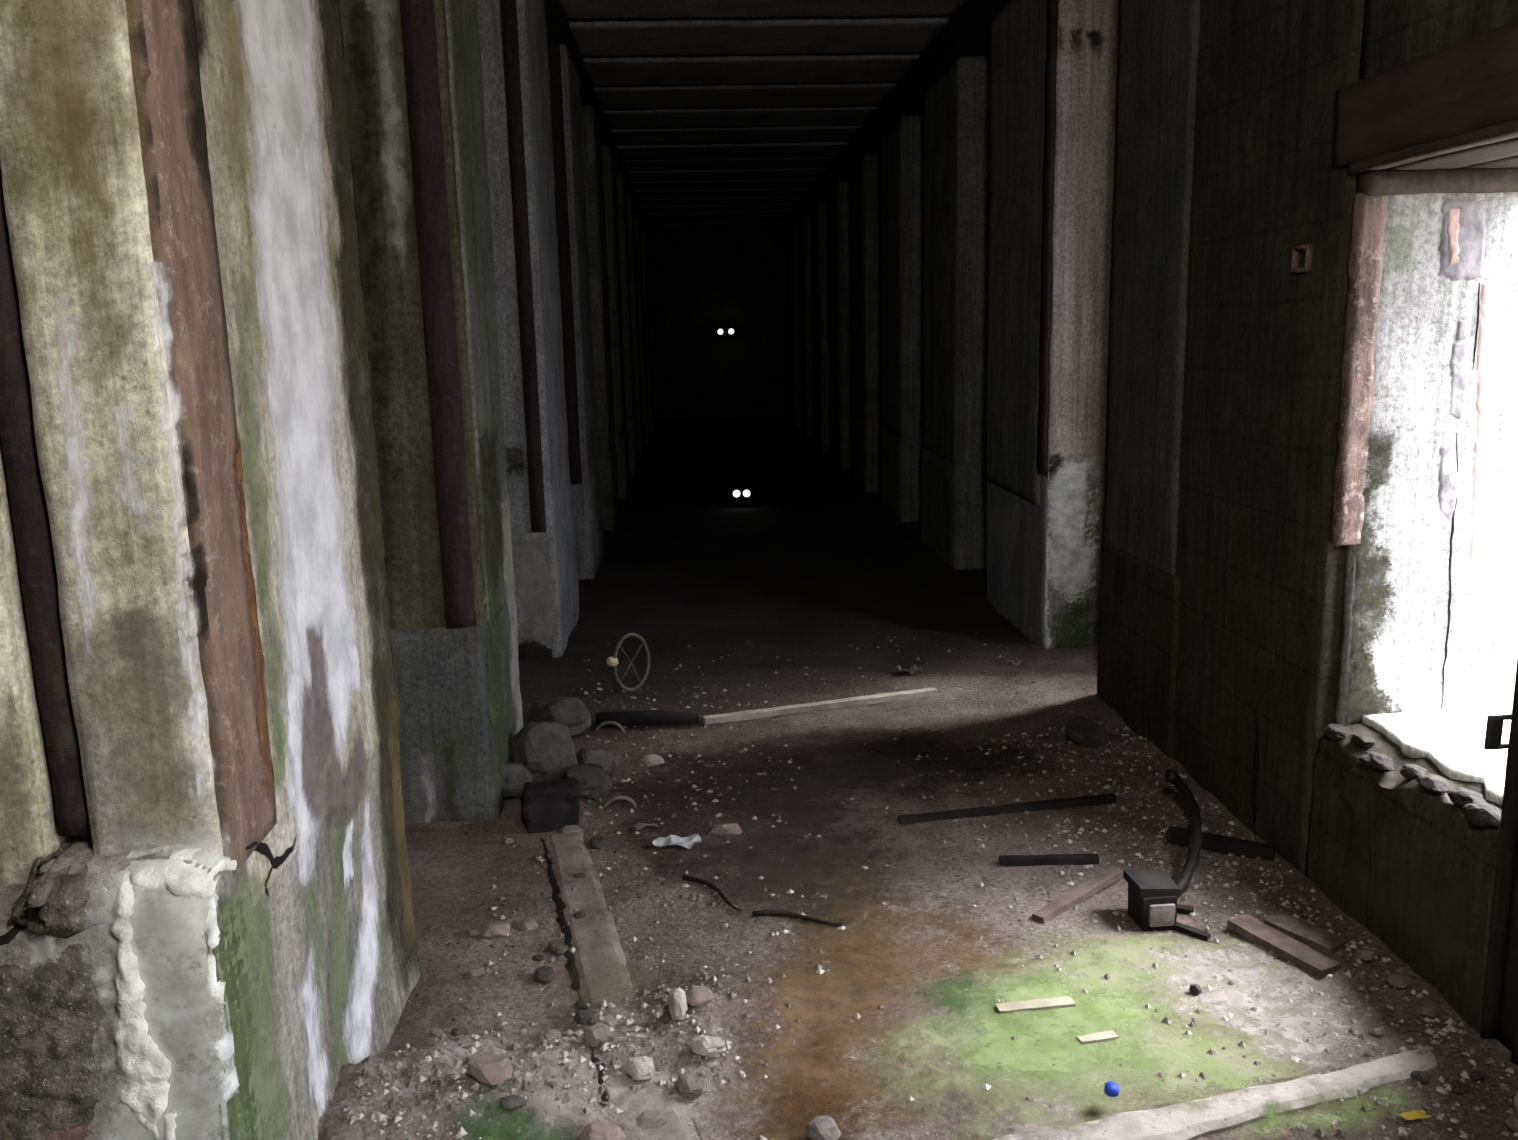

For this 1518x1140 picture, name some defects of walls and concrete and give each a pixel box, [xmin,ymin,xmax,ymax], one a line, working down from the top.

corrosion [134,19,166,147]
corrosion [179,0,210,195]
corrosion [180,449,200,523]
corrosion [187,545,215,637]
corrosion [234,437,274,786]
water stain [222,0,418,1065]
crack [0,921,105,946]
spalling [0,835,106,1140]
water stain [86,832,288,1140]
crack [245,830,299,897]
water stain [301,954,327,1112]
water stain [422,748,460,823]